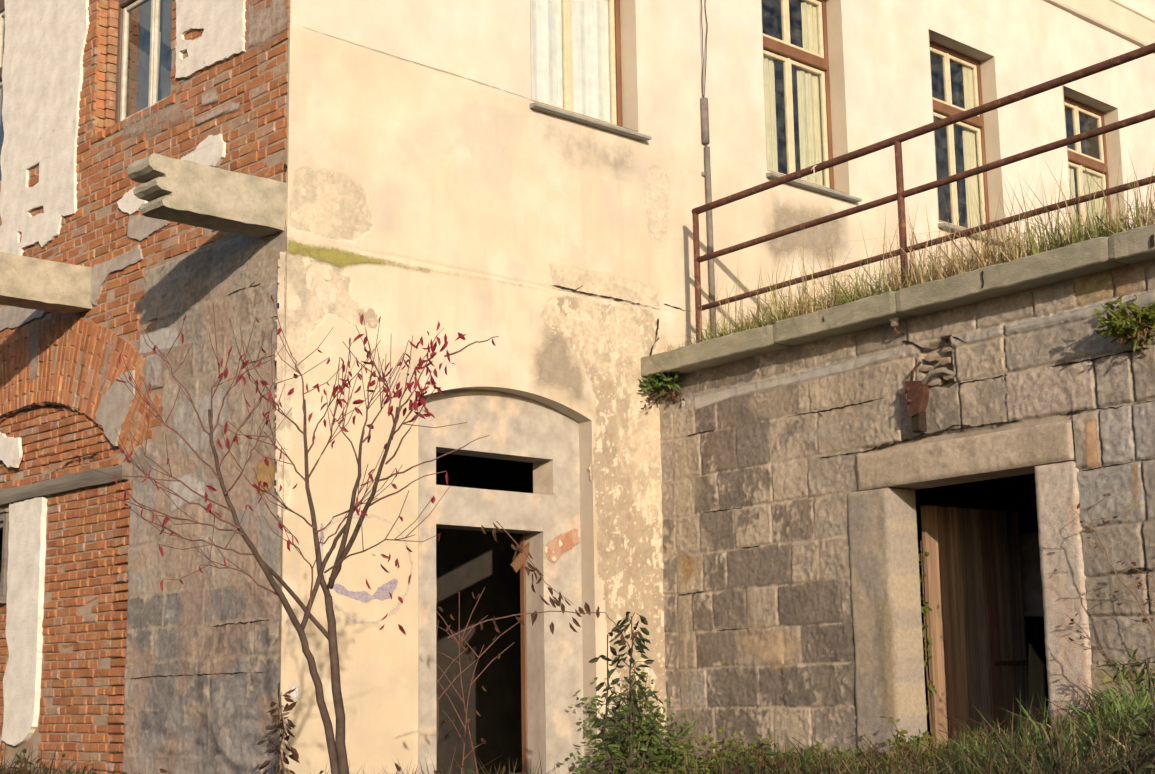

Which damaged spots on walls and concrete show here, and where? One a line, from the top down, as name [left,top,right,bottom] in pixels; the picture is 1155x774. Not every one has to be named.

peeling [175,0,247,79]
peeling [0,0,90,256]
peeling [180,134,226,167]
peeling [90,187,171,305]
spalling [286,168,373,241]
water stain [770,208,840,258]
peeling [0,306,46,331]
peeling [95,370,136,446]
peeling [274,252,379,517]
peeling [0,432,23,468]
peeling [540,264,667,749]